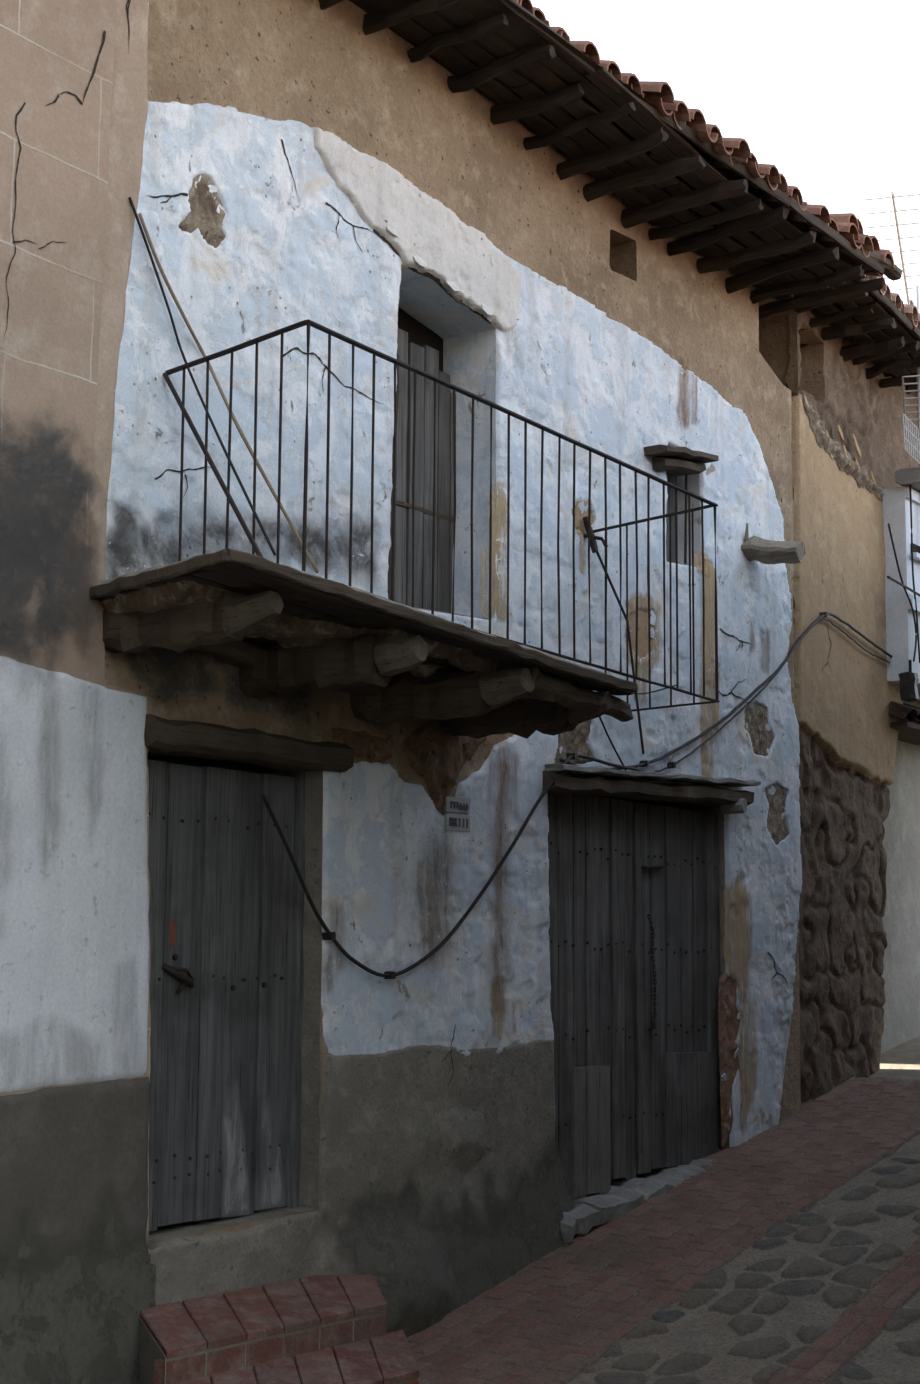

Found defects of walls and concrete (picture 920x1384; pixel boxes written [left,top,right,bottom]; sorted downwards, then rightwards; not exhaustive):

crack [4,0,131,336]
spalling [179,174,225,248]
spalling [555,720,595,764]
spalling [744,702,774,756]
spalling [765,783,789,845]
leakage [723,878,757,1124]
spalling [718,972,743,1148]